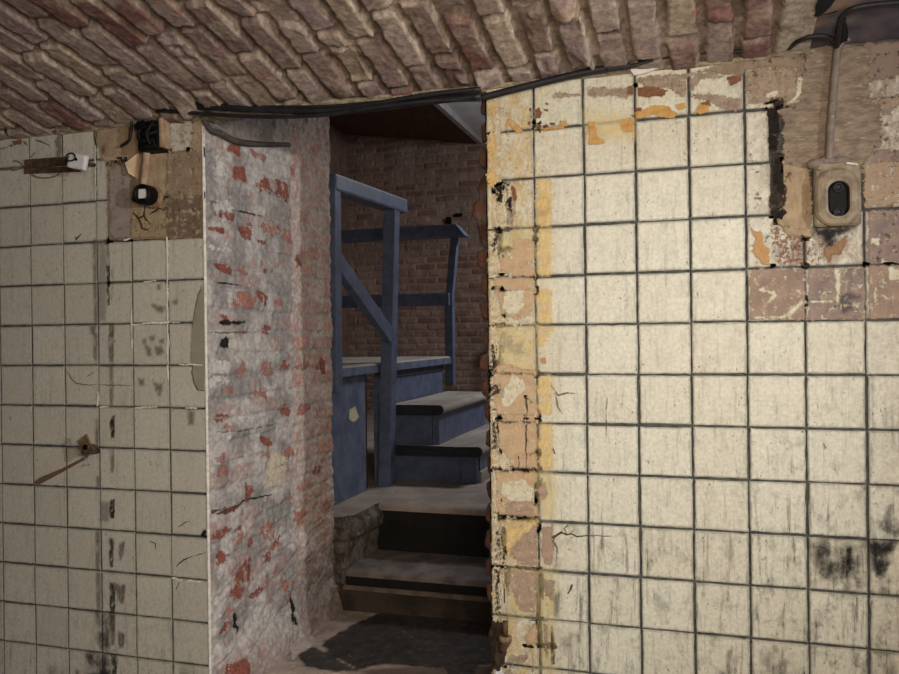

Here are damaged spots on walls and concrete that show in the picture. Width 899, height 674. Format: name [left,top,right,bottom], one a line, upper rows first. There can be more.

flaking render [96,120,295,246]
peeling [214,262,248,276]
peeling [220,290,283,321]
peeling [261,353,326,376]
peeling [486,40,899,674]
peeling [259,435,272,458]
peeling [210,522,280,634]
crack [551,525,607,561]
water stain [813,542,859,578]
water stain [870,524,899,576]
water stain [86,622,118,674]
peeling [225,658,251,674]